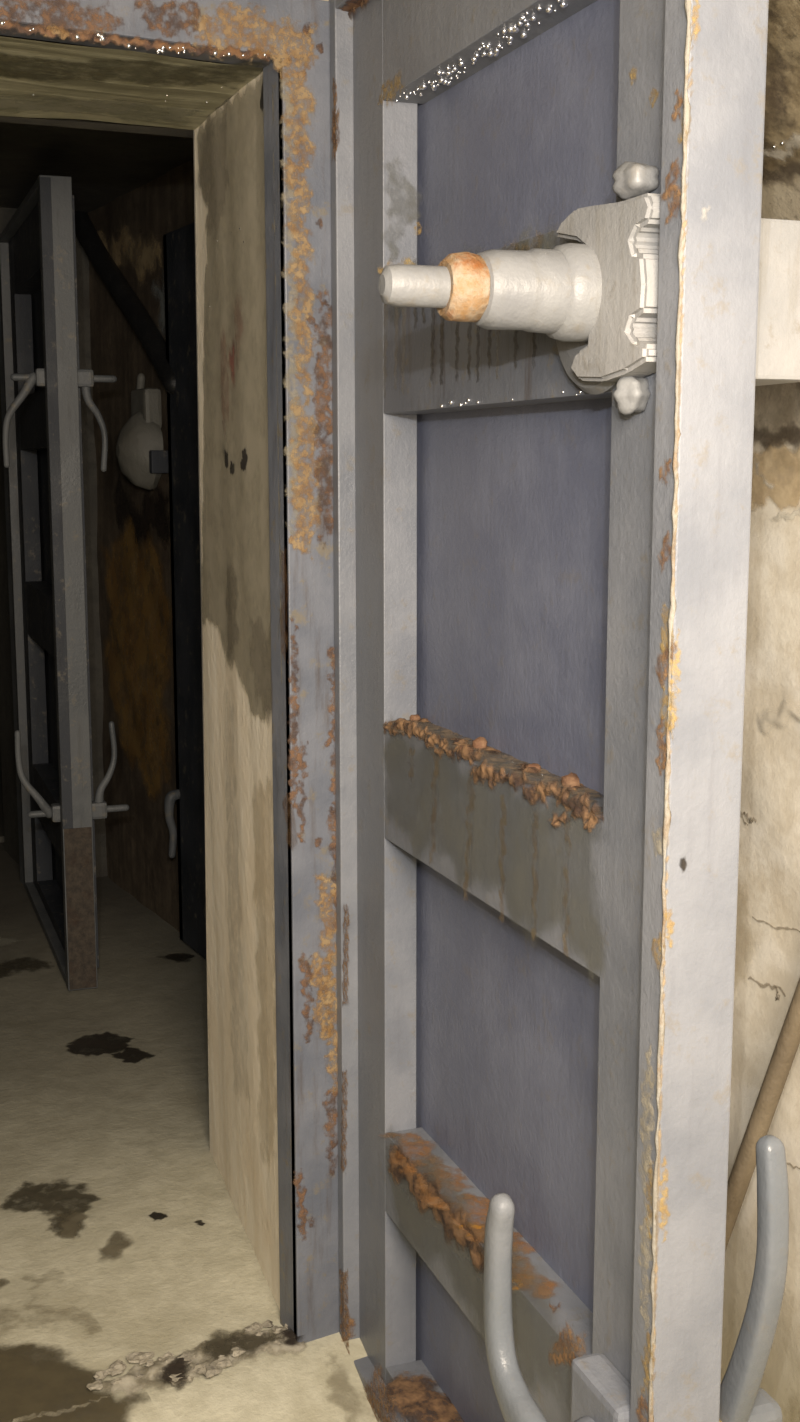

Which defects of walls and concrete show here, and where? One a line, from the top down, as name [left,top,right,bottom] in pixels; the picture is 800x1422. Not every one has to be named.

leakage [765,57,787,120]
leakage [762,135,800,181]
rust [0,0,334,559]
rust [383,714,603,831]
rust [288,619,349,1176]
crack [752,916,800,932]
crack [751,978,786,1001]
leakage [67,1032,154,1063]
leakage [1,1182,99,1238]
rust [383,1133,490,1272]
leakage [0,1344,140,1422]
rust [364,1367,464,1422]